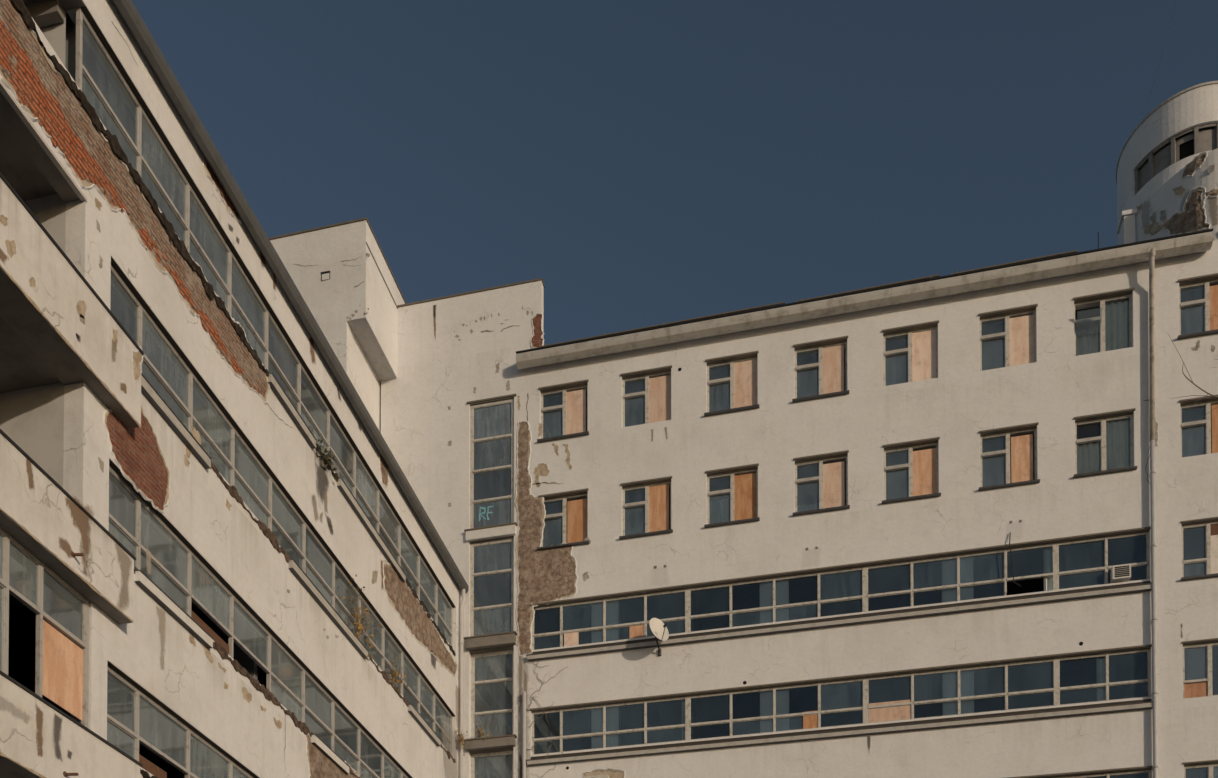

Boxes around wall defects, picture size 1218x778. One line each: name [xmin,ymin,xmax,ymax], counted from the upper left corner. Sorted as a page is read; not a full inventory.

flaking render [0,0,271,405]
flaking render [1136,152,1218,236]
flaking render [0,215,171,513]
flaking render [454,306,544,349]
spalling [0,508,134,622]
flaking render [372,562,458,677]
flaking render [495,363,591,657]
flaking render [305,734,360,778]